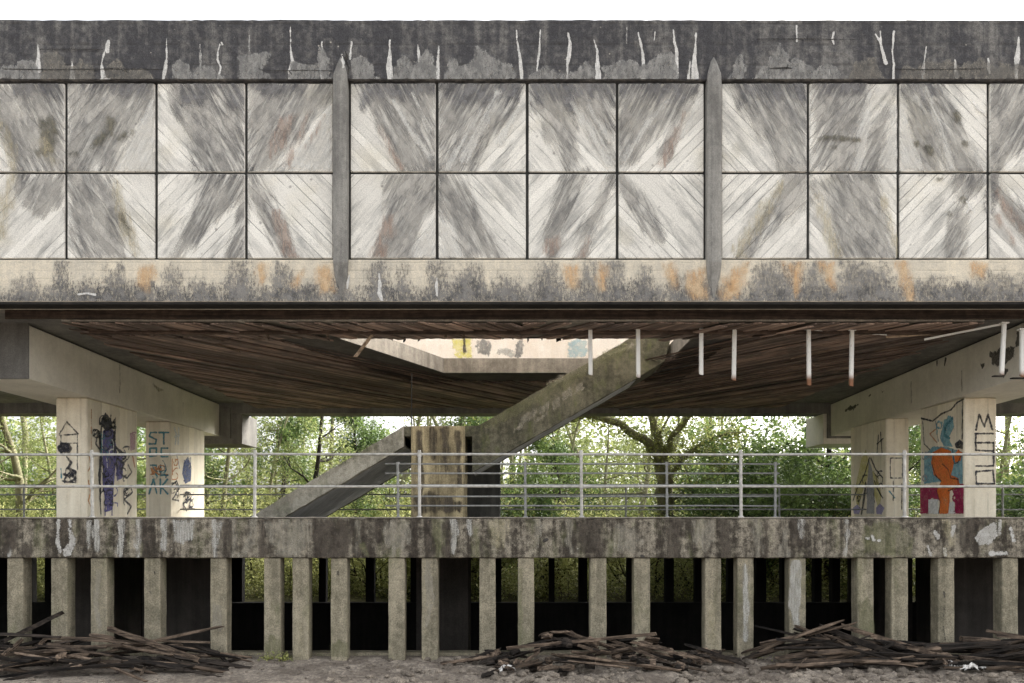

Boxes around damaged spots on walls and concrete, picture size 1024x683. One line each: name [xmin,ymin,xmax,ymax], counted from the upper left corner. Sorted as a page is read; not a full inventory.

water stain [0,27,1024,301]
corrosion [666,265,707,299]
spalling [980,331,1019,378]
water stain [411,426,473,557]
water stain [59,519,100,557]
water stain [117,519,194,557]
water stain [211,519,233,557]
water stain [257,519,268,557]
water stain [312,519,383,557]
water stain [959,519,993,553]
spalling [975,519,1016,556]